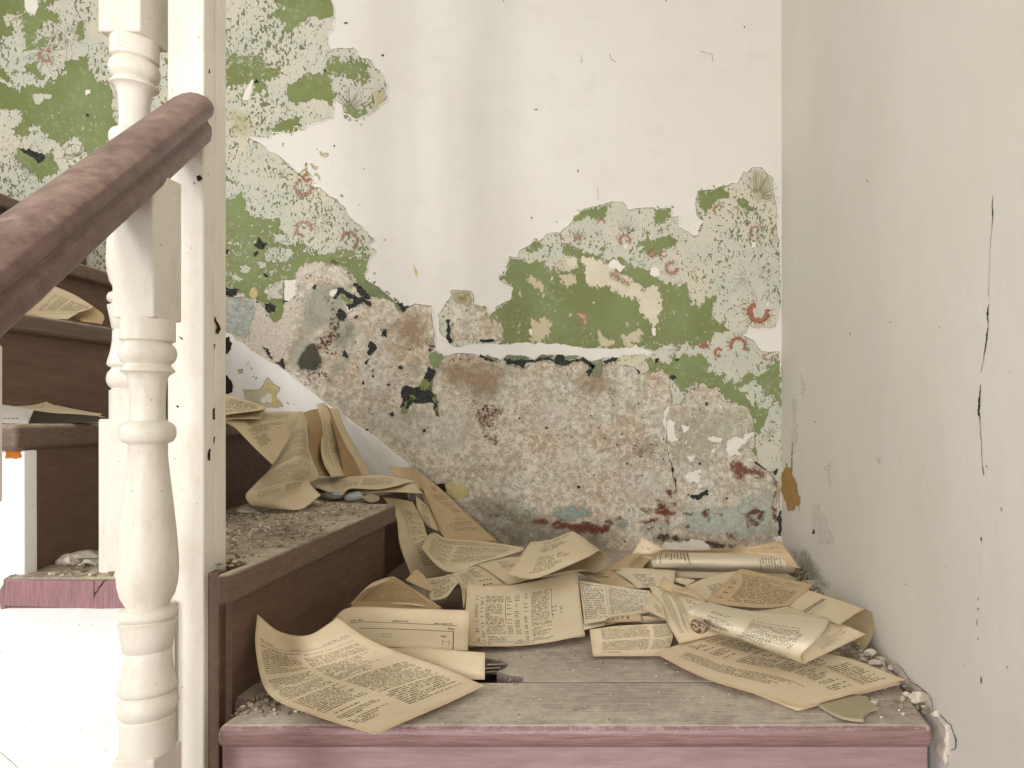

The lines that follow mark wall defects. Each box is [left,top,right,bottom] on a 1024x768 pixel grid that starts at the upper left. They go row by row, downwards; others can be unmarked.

peeling [0,0,118,201]
peeling [151,53,168,112]
peeling [86,238,107,272]
flaking render [214,0,801,551]
crack [977,197,993,475]